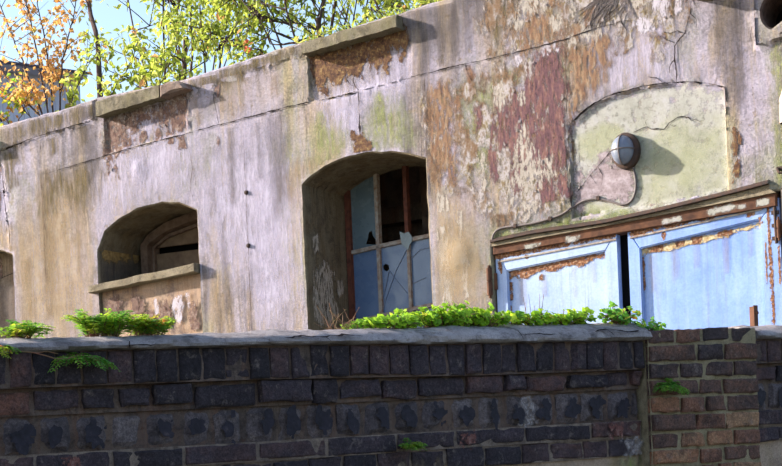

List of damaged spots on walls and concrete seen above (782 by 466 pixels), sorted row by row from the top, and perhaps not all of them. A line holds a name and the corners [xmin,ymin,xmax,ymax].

spalling [302,21,411,96]
crack [0,119,96,243]
peeling [100,93,190,180]
crack [40,74,361,330]
spalling [350,130,372,153]
crack [379,4,727,211]
peeling [417,0,694,230]
peeling [708,203,745,215]
flaking render [104,293,201,331]
flaking render [313,260,344,329]
rust [494,234,616,311]
rust [629,208,781,325]